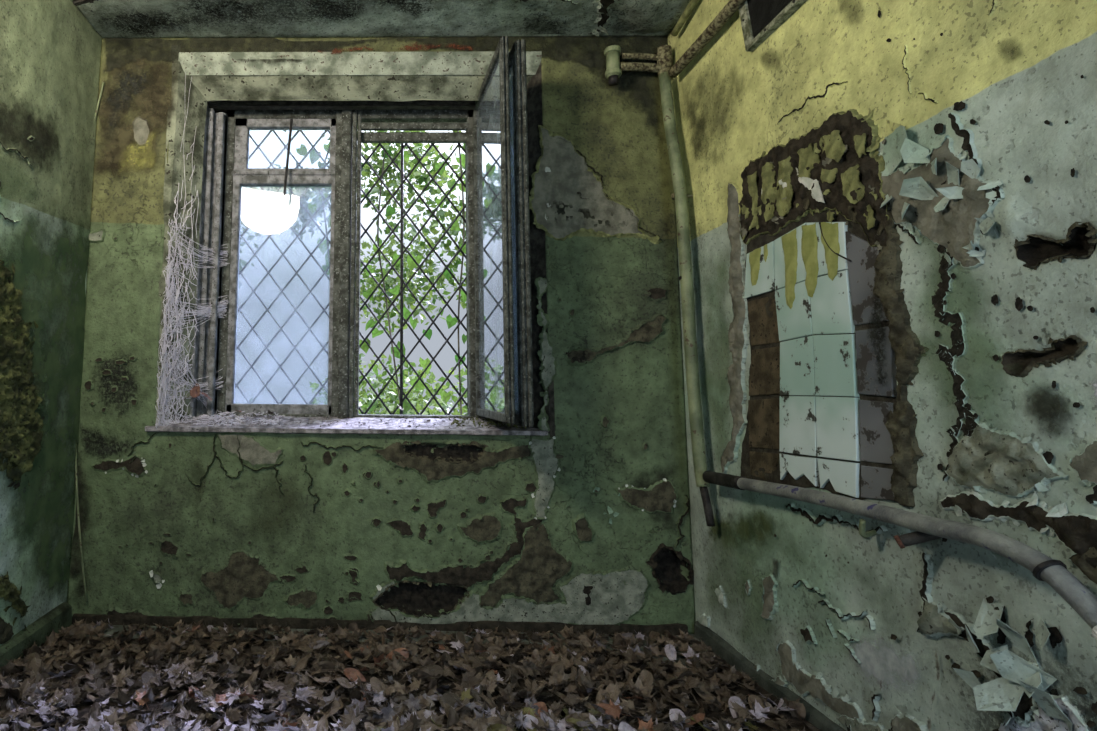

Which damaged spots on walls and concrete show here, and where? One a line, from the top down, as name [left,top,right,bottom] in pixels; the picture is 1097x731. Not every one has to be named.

peeling [591,0,616,36]
crack [989,0,998,16]
peeling [529,125,662,244]
spalling [1015,297,1033,311]
damp [93,355,137,415]
crack [187,434,383,513]
flaking render [369,277,678,625]
flaking render [0,613,14,646]
peeling [772,625,929,731]
peeling [917,596,1088,731]